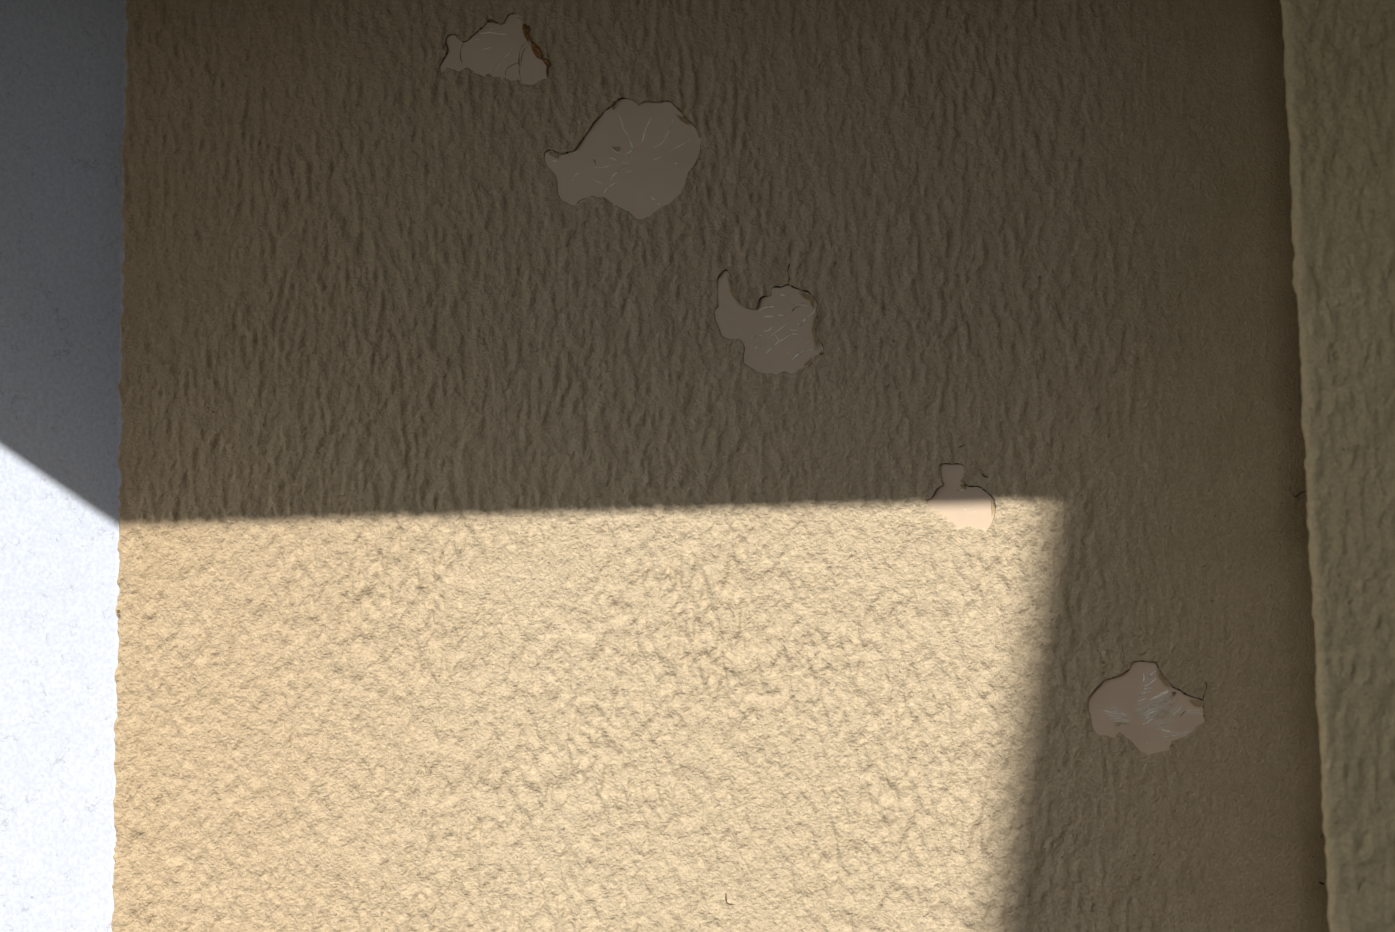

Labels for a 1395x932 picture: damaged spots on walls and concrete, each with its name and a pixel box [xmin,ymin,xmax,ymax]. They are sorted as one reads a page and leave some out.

peeling [440,13,550,85]
peeling [545,98,703,219]
peeling [714,264,824,375]
peeling [927,463,996,529]
peeling [1088,660,1207,755]